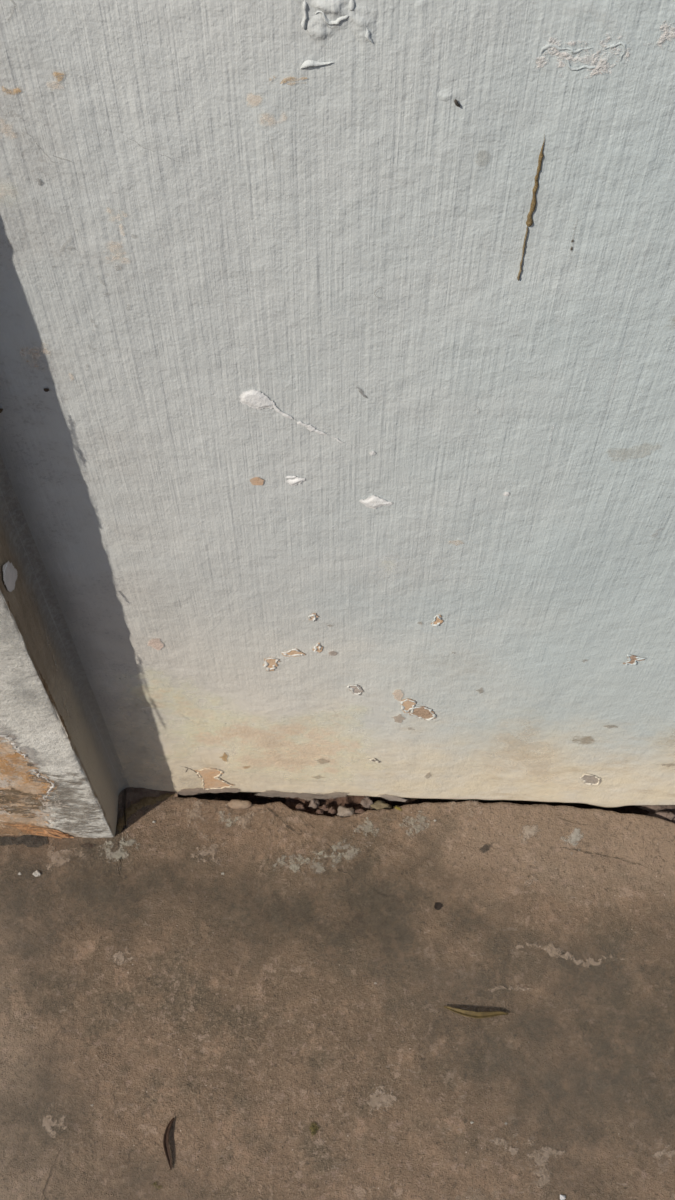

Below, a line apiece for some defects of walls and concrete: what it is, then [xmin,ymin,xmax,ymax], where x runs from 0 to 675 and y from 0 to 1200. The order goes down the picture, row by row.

peeling [3,561,18,615]
peeling [263,643,338,672]
spalling [39,671,74,751]
peeling [392,690,436,723]
peeling [0,735,95,849]
crack [116,766,298,834]
crack [393,798,649,815]